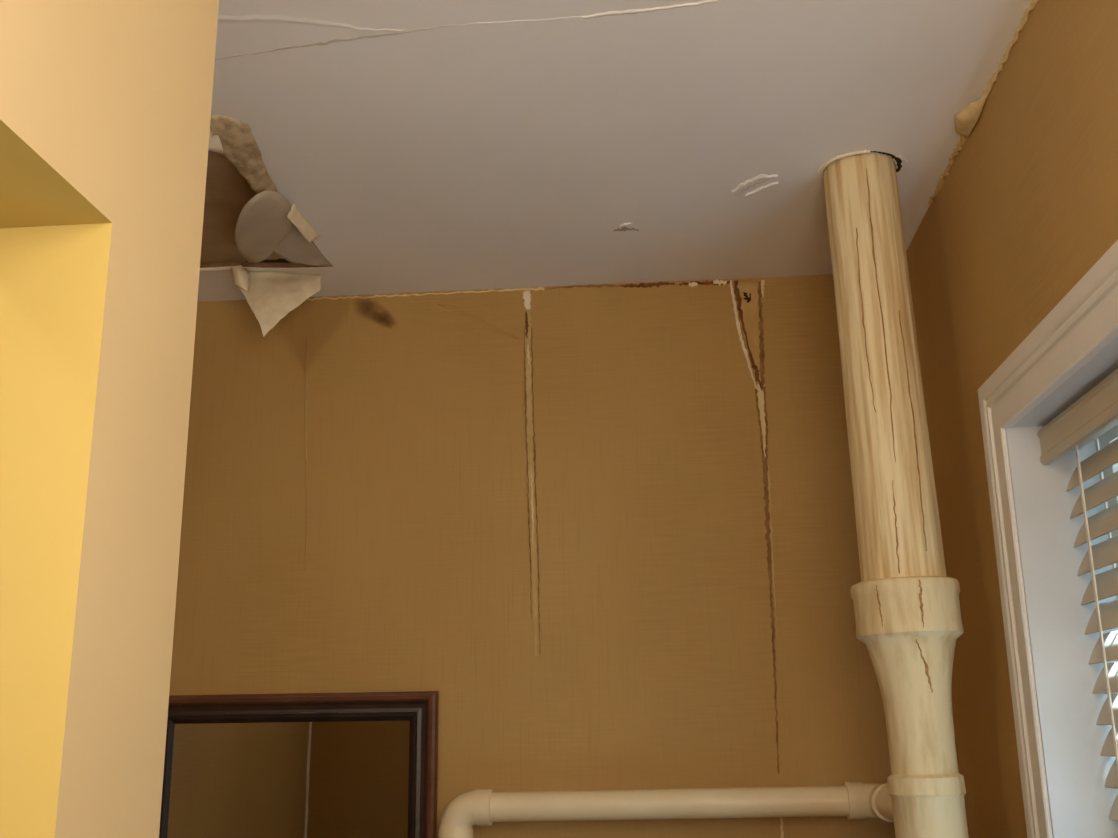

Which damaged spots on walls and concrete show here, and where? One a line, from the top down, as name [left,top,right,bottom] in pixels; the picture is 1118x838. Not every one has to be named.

peeling [287,204,320,243]
crack [856,168,933,693]